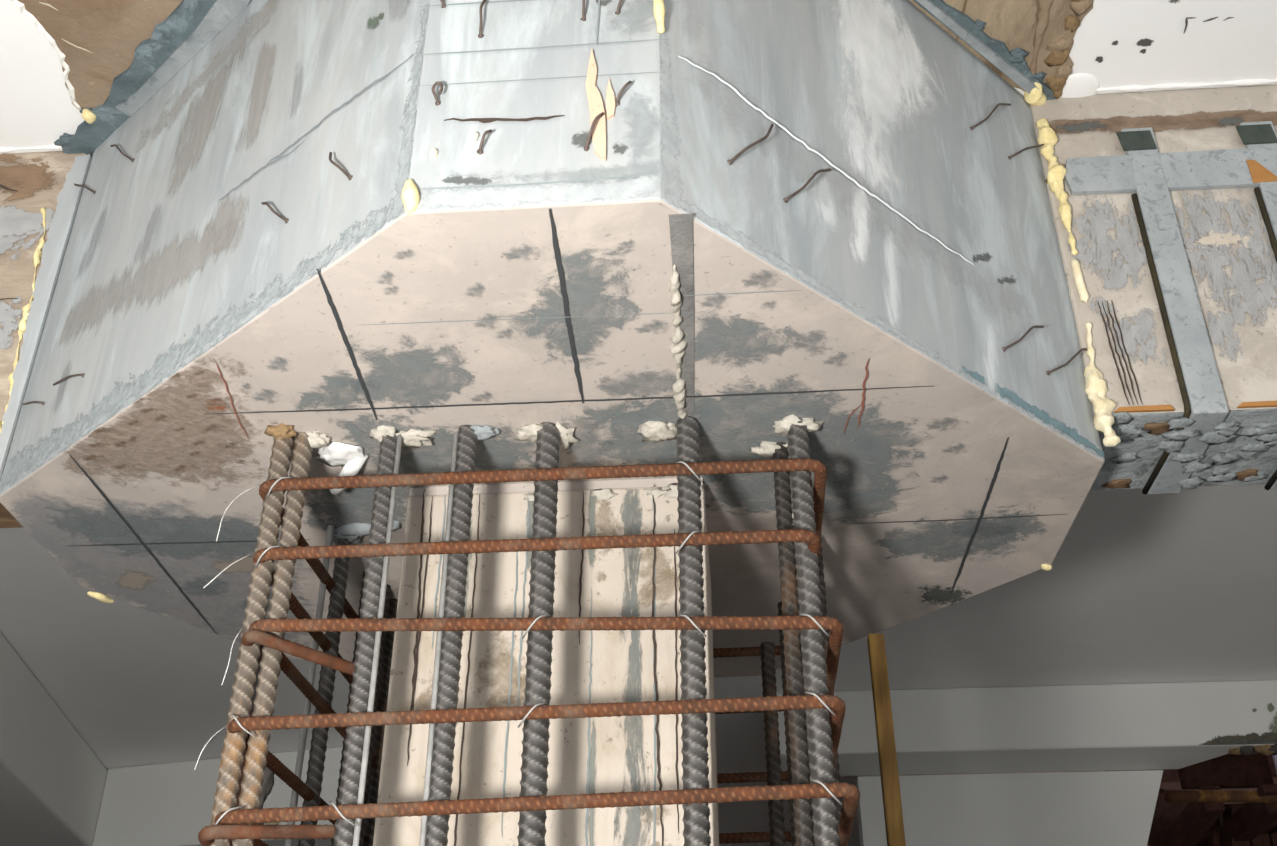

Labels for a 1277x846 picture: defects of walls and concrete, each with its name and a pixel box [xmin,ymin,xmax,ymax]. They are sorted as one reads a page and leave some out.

flaking render [11,0,182,115]
flaking render [909,0,1025,92]
flaking render [943,0,1093,99]
flaking render [1136,38,1154,54]
leakage [838,0,934,261]
peeling [0,154,56,260]
peeling [0,296,23,358]
leakage [505,241,661,359]
leakage [298,337,475,529]
leakage [570,373,923,522]
leakage [18,498,259,643]
leakage [587,489,680,846]